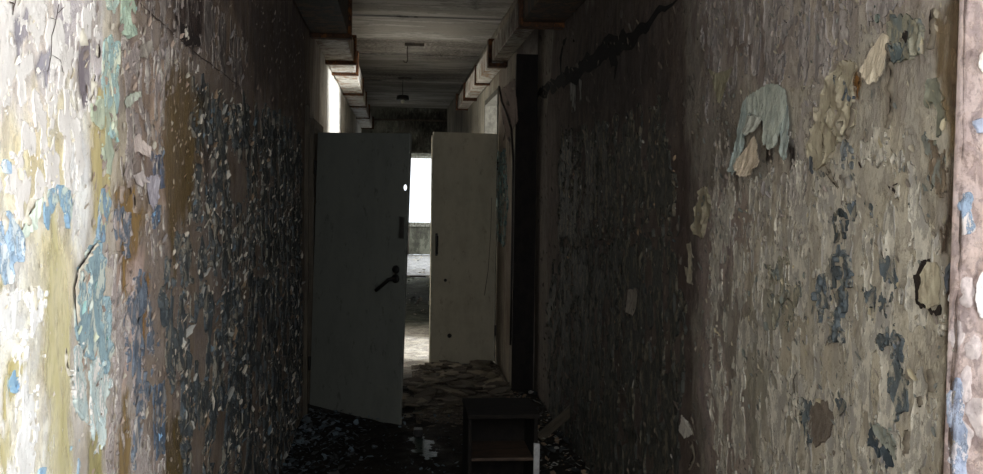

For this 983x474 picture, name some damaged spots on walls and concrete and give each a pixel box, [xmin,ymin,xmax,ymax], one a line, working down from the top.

crack [47,4,64,74]
peeling [0,0,306,474]
peeling [679,0,968,474]
peeling [957,192,976,235]
crack [74,243,99,326]